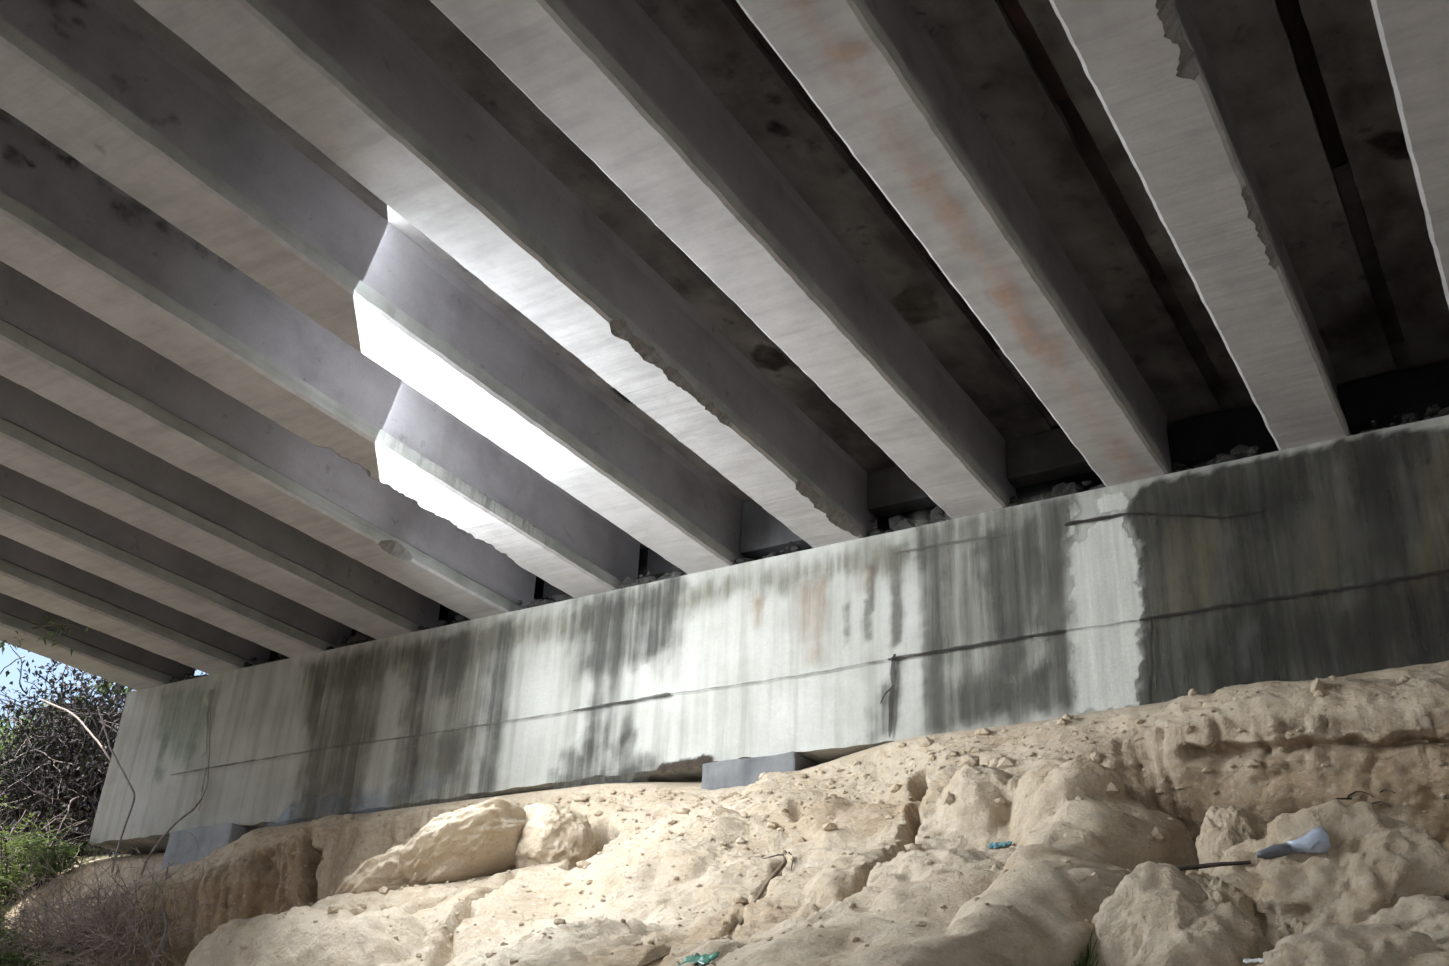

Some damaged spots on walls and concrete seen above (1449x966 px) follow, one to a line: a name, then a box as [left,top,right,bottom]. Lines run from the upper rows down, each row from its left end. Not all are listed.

spalling [1156,0,1200,80]
spalling [1241,186,1278,269]
spalling [610,319,731,426]
water stain [278,622,523,822]
crack [172,629,1073,809]
water stain [542,580,729,789]
spalling [796,479,860,537]
water stain [844,550,908,645]
water stain [917,500,1069,728]
water stain [1126,428,1449,706]
crack [1129,569,1449,704]